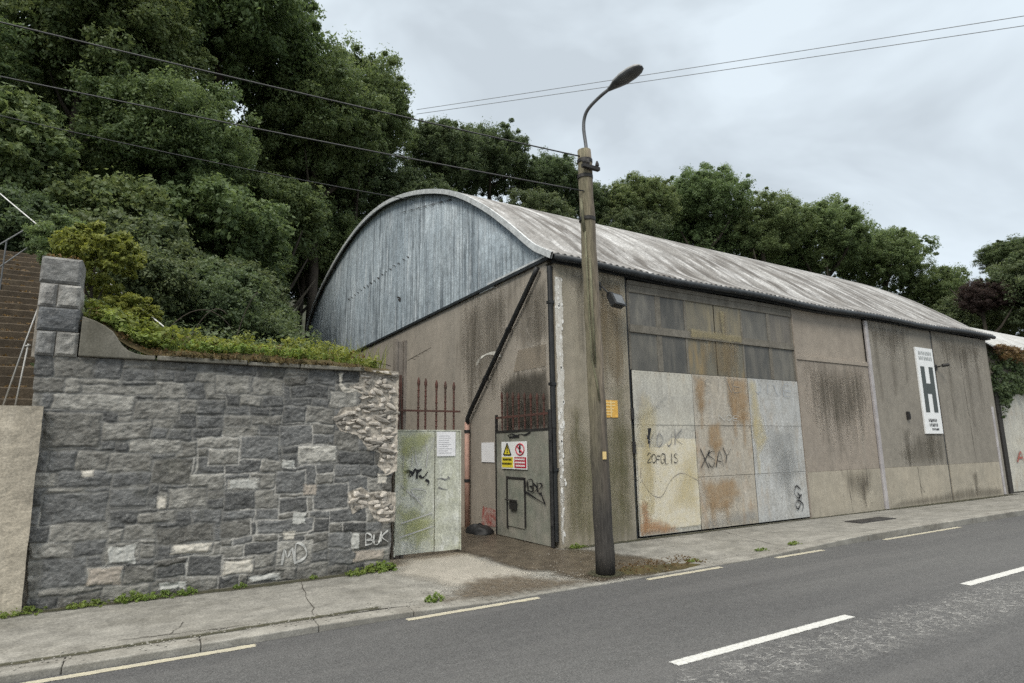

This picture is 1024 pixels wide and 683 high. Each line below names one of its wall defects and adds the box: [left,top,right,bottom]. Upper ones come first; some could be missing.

spalling [332,370,400,475]
damp [504,372,548,430]
spalling [348,487,396,524]